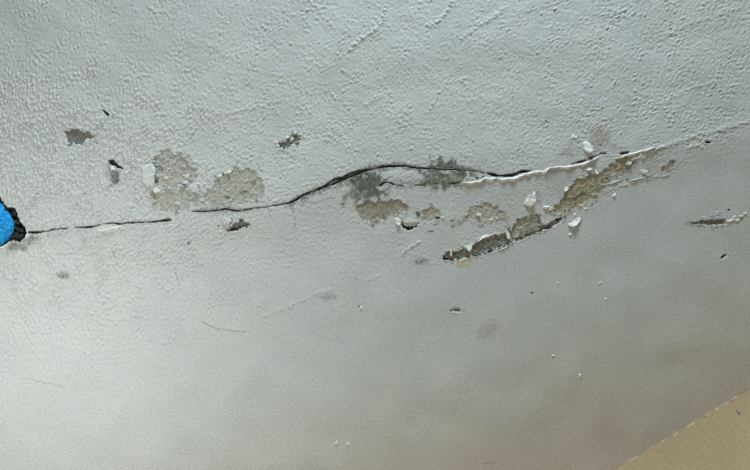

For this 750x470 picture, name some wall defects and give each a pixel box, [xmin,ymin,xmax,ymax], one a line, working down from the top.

spalling [65,127,99,146]
spalling [274,131,302,150]
peeling [571,134,594,154]
peeling [110,159,125,184]
peeling [136,149,264,216]
mould [346,169,385,203]
crack [194,145,659,227]
mould [419,155,475,189]
crack [26,219,169,237]
spalling [217,217,251,231]
peeling [355,156,652,266]
spalling [692,209,747,225]